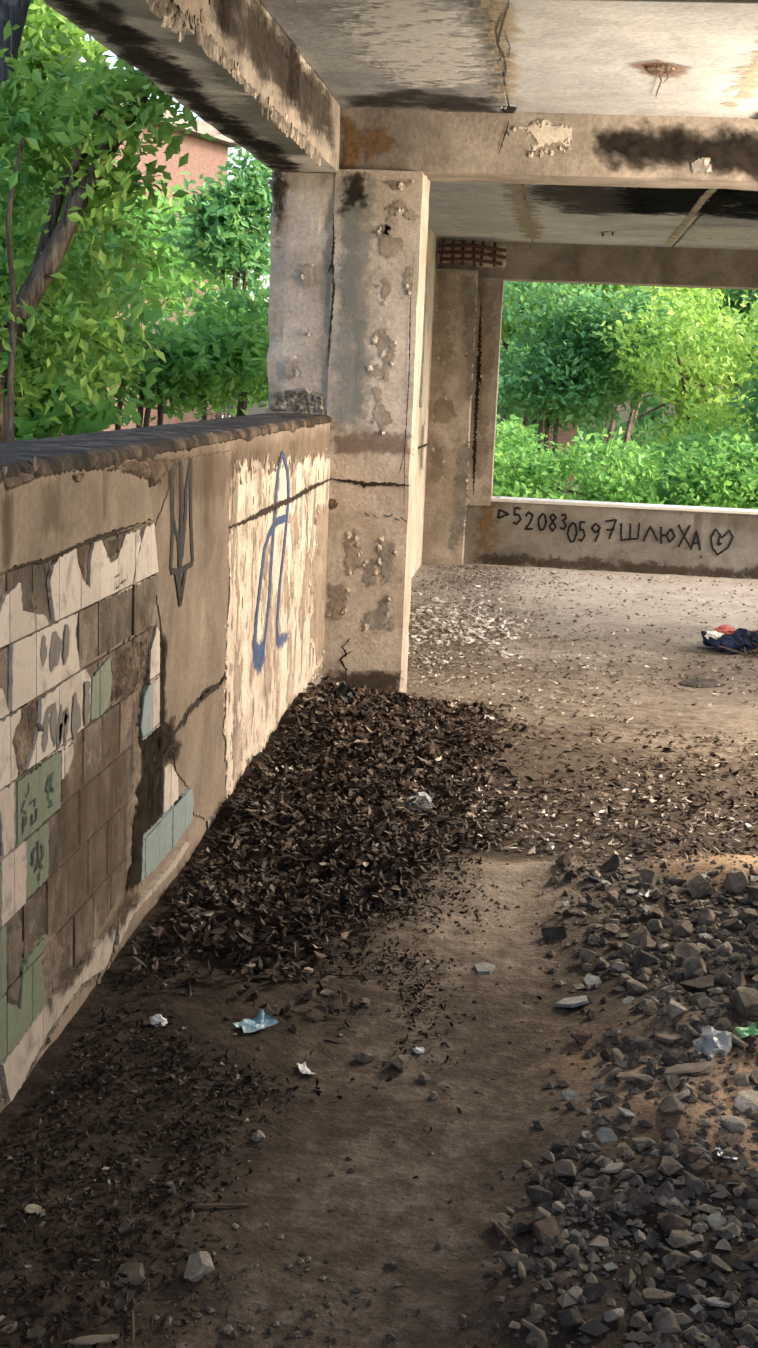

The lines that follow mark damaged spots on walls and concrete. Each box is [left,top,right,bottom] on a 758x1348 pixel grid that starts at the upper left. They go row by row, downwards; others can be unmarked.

spalling [144,0,321,166]
water stain [290,40,301,103]
crack [496,0,511,87]
corrosion [634,61,692,78]
water stain [722,189,758,207]
water stain [334,116,396,431]
crack [230,258,428,528]
crack [472,302,482,494]
spalling [73,532,121,583]
spalling [106,625,150,711]
spalling [12,700,38,775]
water stain [109,635,168,937]